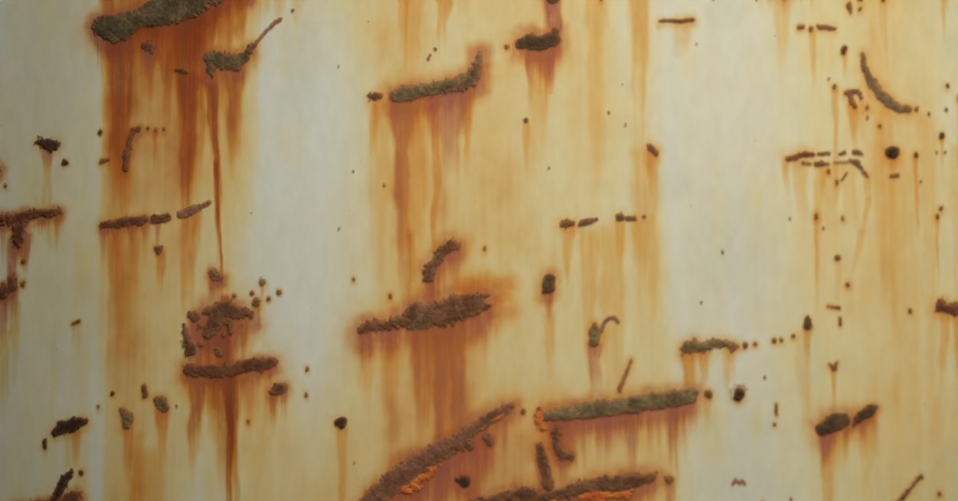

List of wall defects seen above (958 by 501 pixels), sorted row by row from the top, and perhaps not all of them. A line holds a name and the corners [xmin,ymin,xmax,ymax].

corrosion [92,0,222,53]
corrosion [203,17,282,77]
corrosion [505,28,561,50]
corrosion [366,52,482,102]
corrosion [0,206,63,248]
corrosion [180,277,282,378]
corrosion [357,290,492,333]
corrosion [679,337,758,356]
corrosion [935,296,958,316]
corrosion [815,404,878,435]
corrosion [359,388,712,501]
corrosion [35,468,83,501]